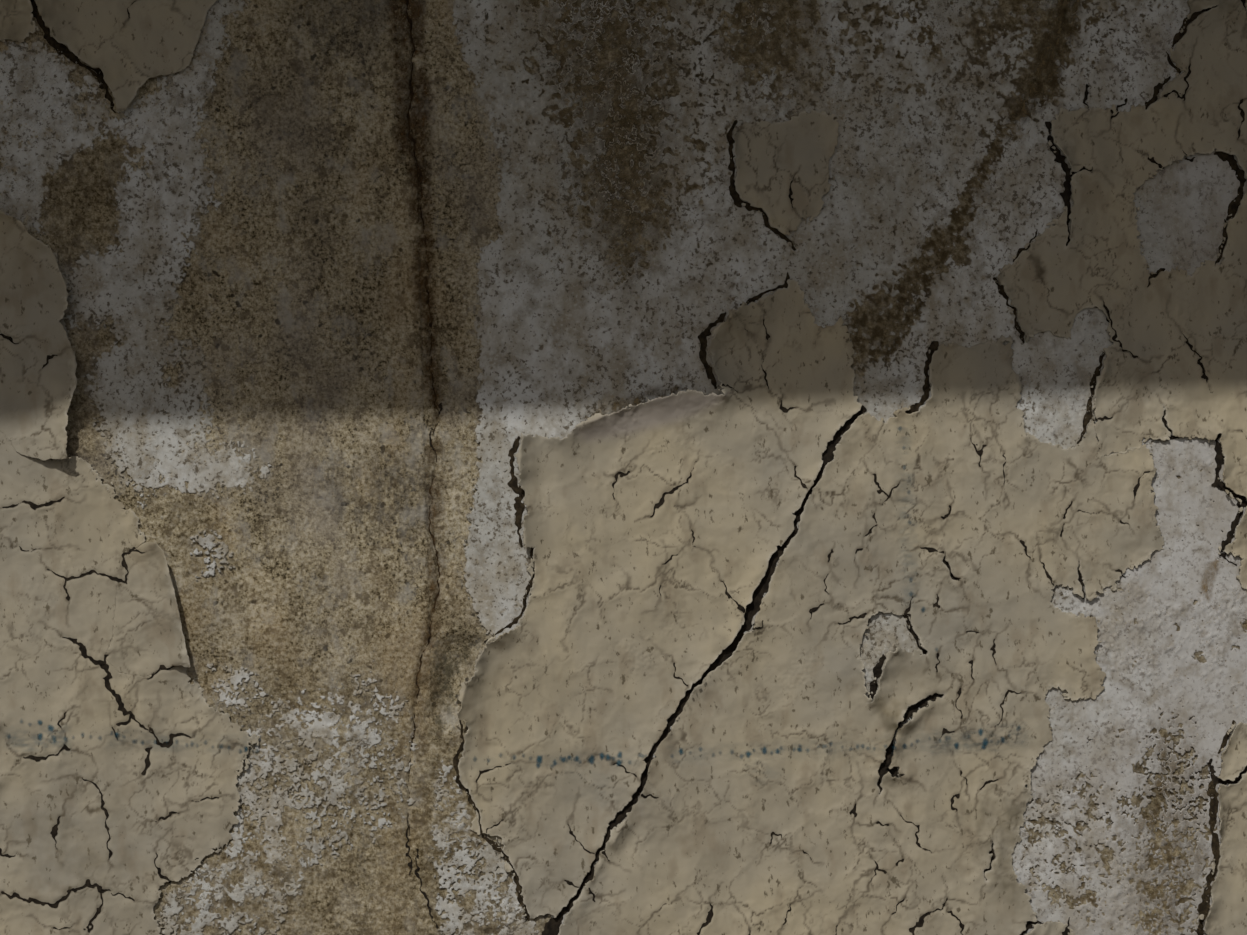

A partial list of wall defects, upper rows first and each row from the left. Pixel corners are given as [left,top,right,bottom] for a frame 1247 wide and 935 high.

peeling [0,0,216,112]
crack [993,121,1092,344]
crack [1148,99,1246,264]
crack [1077,301,1138,444]
crack [16,546,145,601]
peeling [0,210,260,935]
peeling [452,0,1247,935]
crack [809,474,900,625]
crack [1211,430,1247,566]
crack [63,637,191,775]
crack [453,405,867,935]
crack [1,778,134,932]